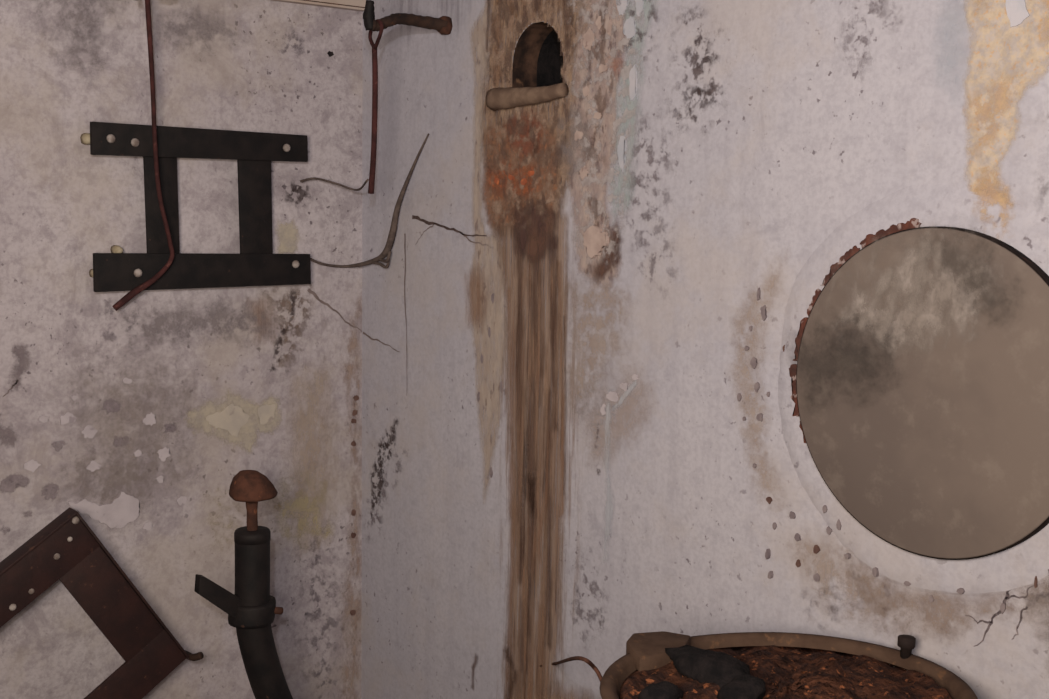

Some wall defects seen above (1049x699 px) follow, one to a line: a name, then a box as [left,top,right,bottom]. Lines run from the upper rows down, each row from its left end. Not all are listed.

leakage [674,22,717,122]
peeling [966,0,1049,224]
leakage [470,0,585,488]
flaking render [3,346,29,397]
flaking render [0,414,16,445]
peeling [0,459,41,492]
flaking render [42,460,152,530]
peeling [142,412,176,432]
peeling [157,446,170,461]
leakage [371,420,400,524]
leakage [847,575,964,633]